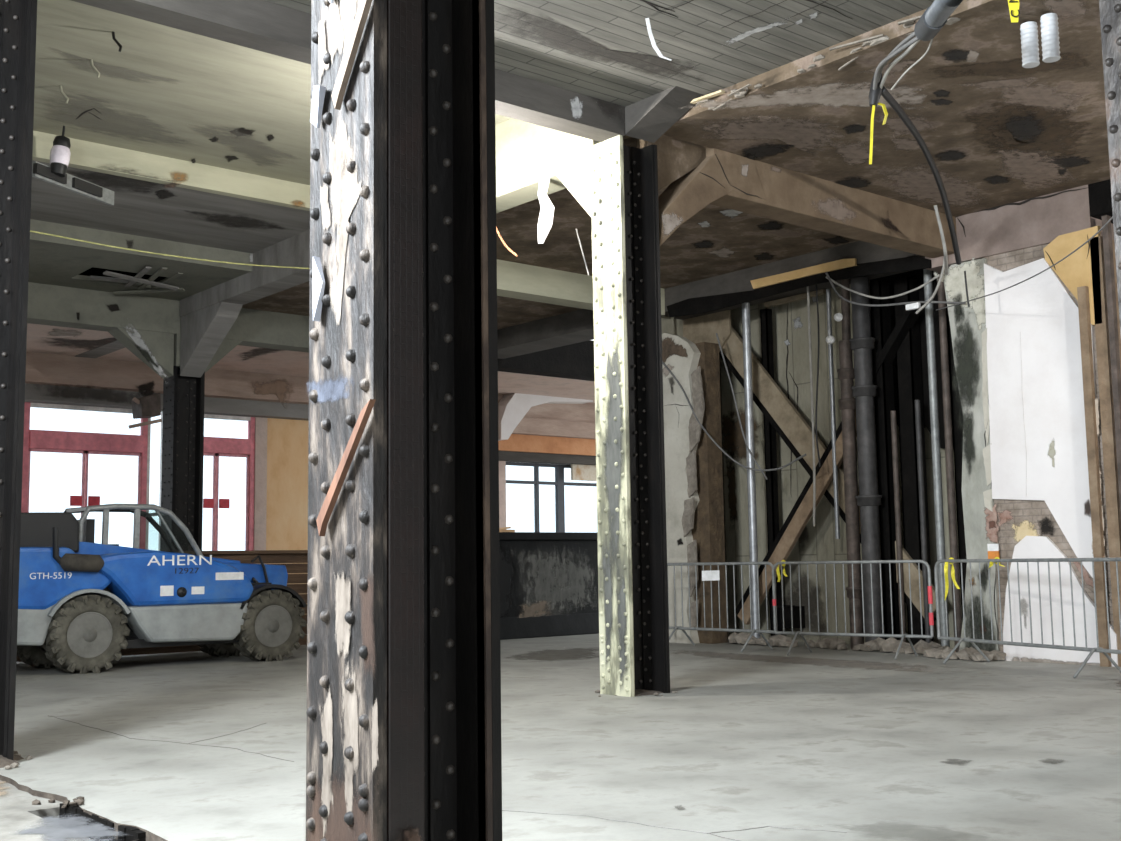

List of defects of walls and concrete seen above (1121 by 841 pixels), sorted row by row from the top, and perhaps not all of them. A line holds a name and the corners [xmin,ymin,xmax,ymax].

damp [935,53,1087,78]
peeling [700,60,1090,207]
damp [966,102,1089,159]
peeling [320,121,361,324]
damp [953,295,979,474]
spalling [934,258,1114,666]
rust [360,580,374,668]
crack [51,716,294,762]
peeling [320,573,358,837]
spalling [59,803,146,841]
rust [308,779,373,841]
crack [502,810,847,841]